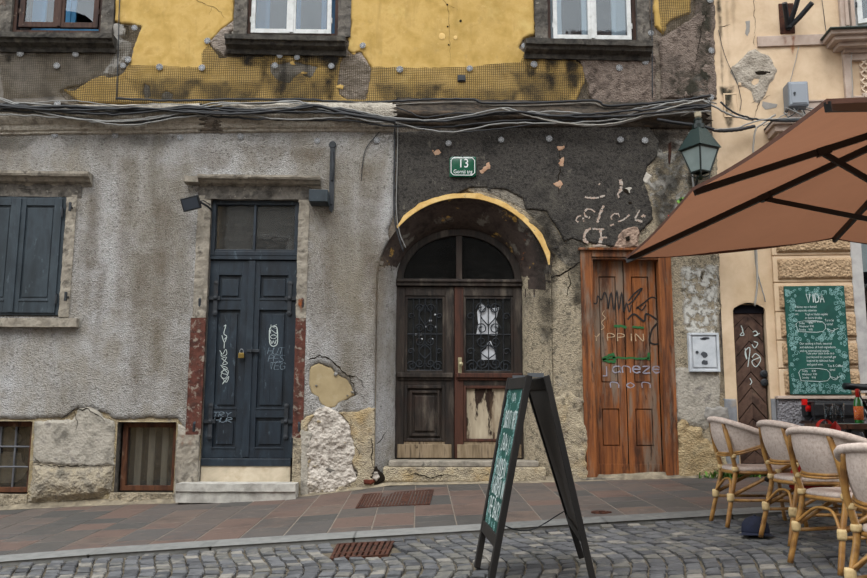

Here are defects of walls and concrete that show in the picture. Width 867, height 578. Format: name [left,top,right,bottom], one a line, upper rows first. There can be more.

flaking render [103,23,132,75]
flaking render [210,20,234,58]
flaking render [336,49,371,100]
flaking render [730,49,777,109]
flaking render [306,363,358,493]
spalling [370,466,385,485]